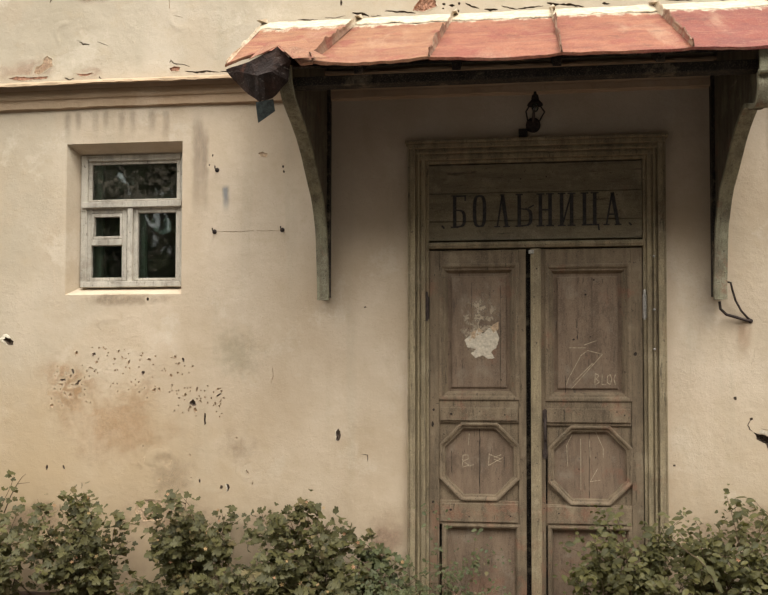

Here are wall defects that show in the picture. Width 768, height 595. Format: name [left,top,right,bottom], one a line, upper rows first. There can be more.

peeling [413,0,460,13]
crack [466,2,610,12]
peeling [9,56,55,81]
crack [170,60,227,73]
spalling [49,346,225,418]